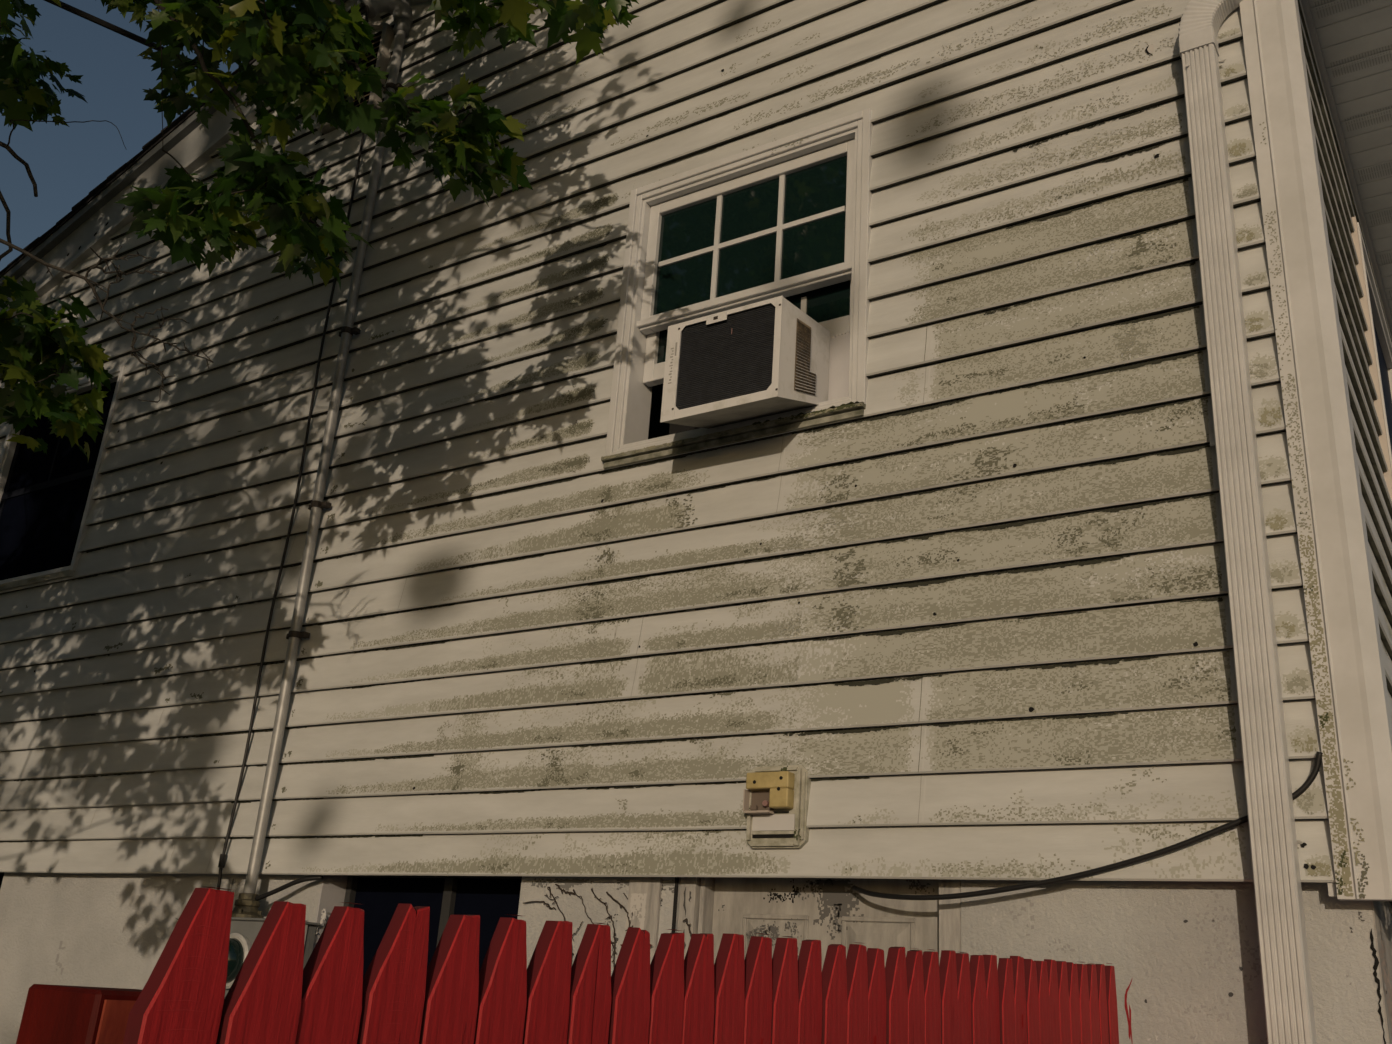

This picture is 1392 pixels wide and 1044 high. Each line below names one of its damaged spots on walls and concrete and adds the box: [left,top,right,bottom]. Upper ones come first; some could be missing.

water stain [1124,235,1177,273]
water stain [538,456,590,473]
water stain [897,396,1084,522]
water stain [639,478,698,528]
water stain [806,474,873,632]
water stain [896,549,958,568]
water stain [1044,507,1145,557]
water stain [576,486,647,694]
water stain [1236,210,1392,975]
water stain [666,669,769,698]
water stain [534,733,589,787]
crack [1370,928,1386,1044]